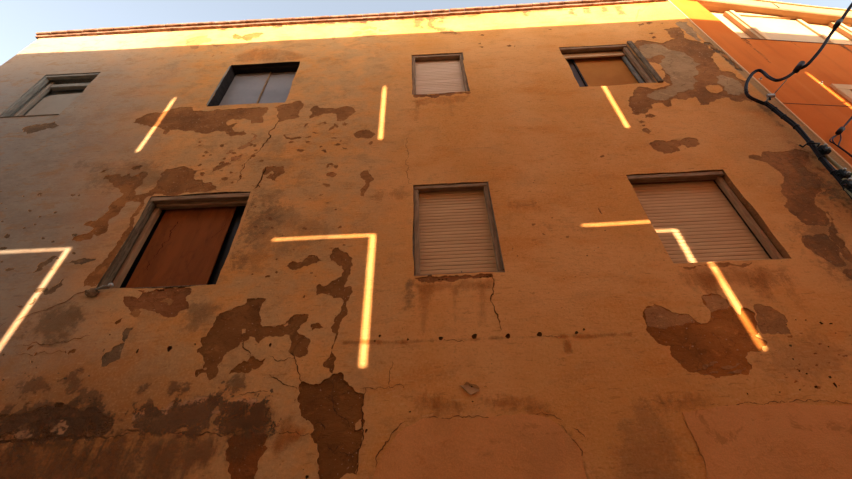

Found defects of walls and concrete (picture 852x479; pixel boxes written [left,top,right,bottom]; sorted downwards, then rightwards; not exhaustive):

flaking render [628,21,753,154]
peeling [69,101,356,287]
crack [238,120,279,189]
peeling [354,130,376,145]
peeling [359,170,374,196]
peeling [749,149,852,280]
peeling [17,277,66,308]
flaking render [101,287,191,367]
peeling [124,239,368,479]
crack [490,277,502,330]
flaking render [643,293,806,378]
crack [268,365,403,473]